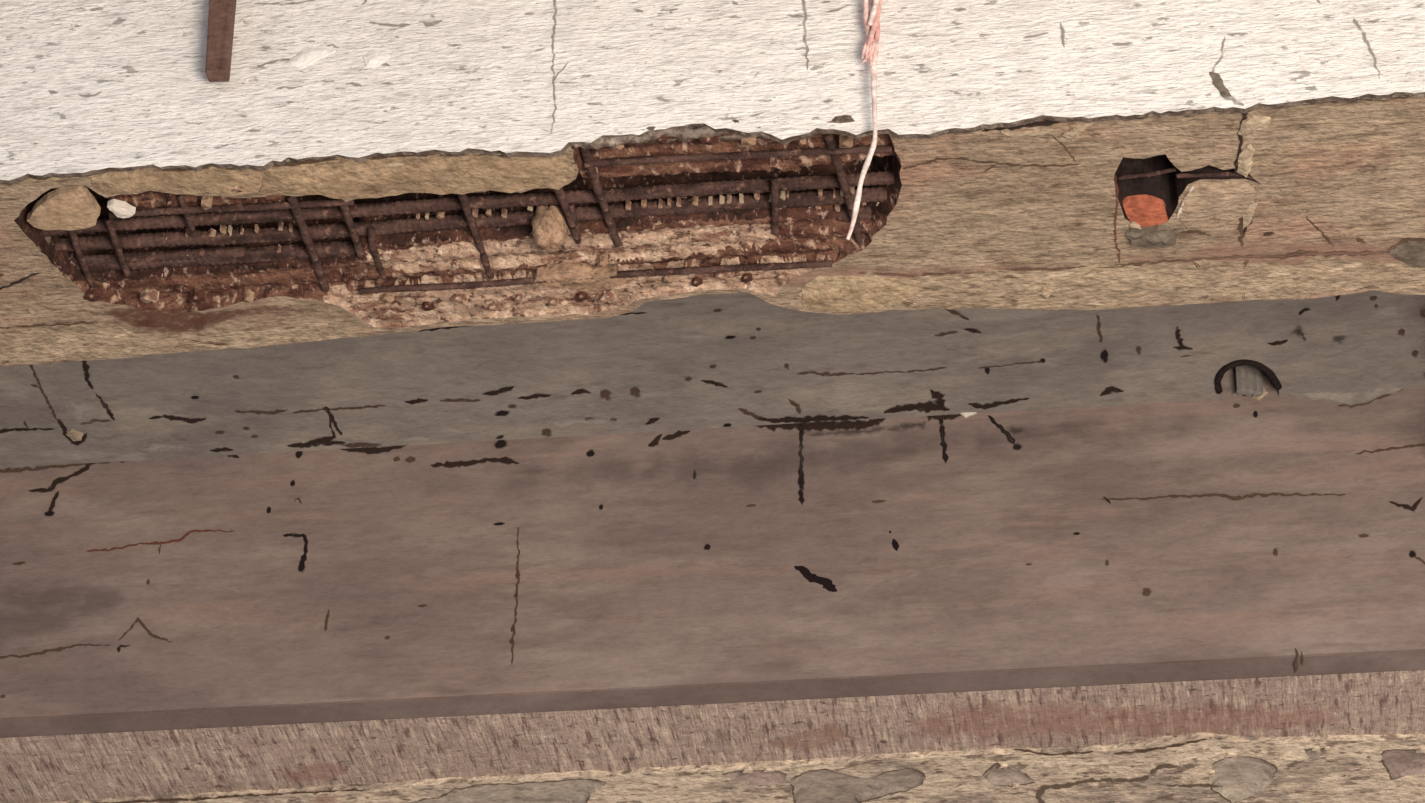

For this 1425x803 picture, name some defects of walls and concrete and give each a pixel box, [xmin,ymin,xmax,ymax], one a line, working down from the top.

crack [788,0,809,70]
crack [1058,23,1066,47]
crack [1353,19,1380,79]
spalling [0,92,1425,328]
corrosion [111,309,258,346]
crack [797,309,1045,376]
crack [0,364,61,433]
crack [82,360,115,421]
crack [149,386,590,424]
crack [0,461,125,516]
crack [510,528,520,663]
crack [0,618,171,659]